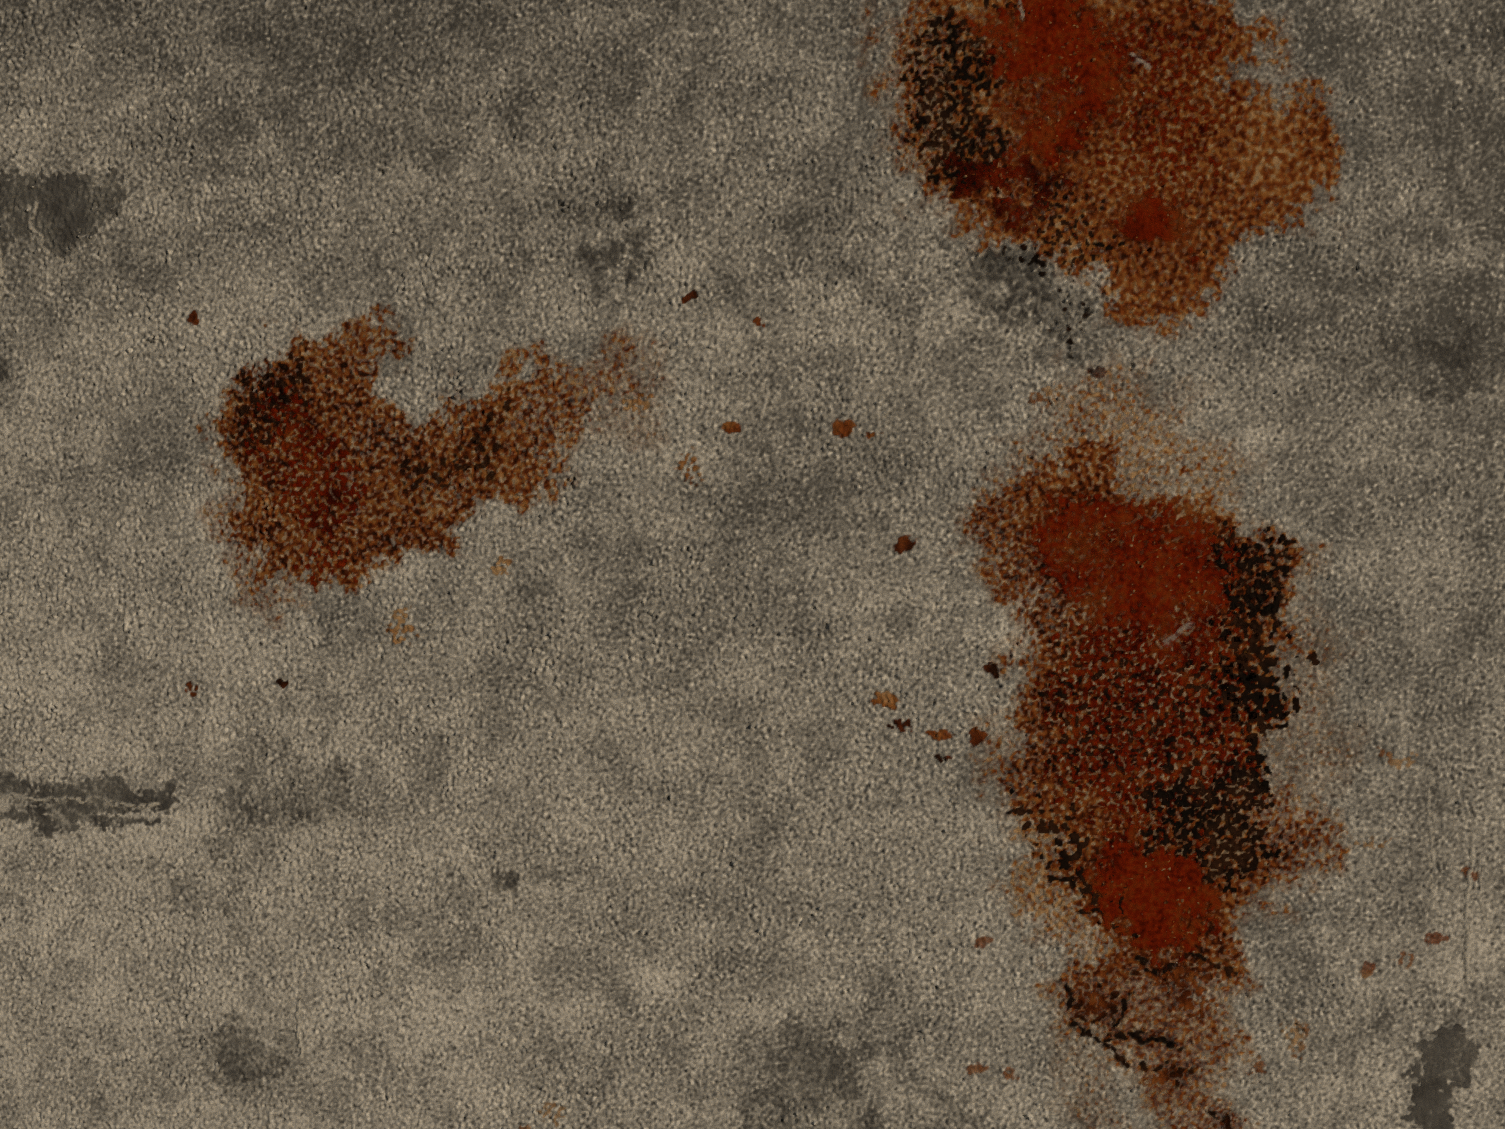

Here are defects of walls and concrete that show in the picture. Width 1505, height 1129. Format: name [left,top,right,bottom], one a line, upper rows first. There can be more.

corrosion [865,0,1345,340]
corrosion [196,304,659,620]
corrosion [871,364,1387,1129]